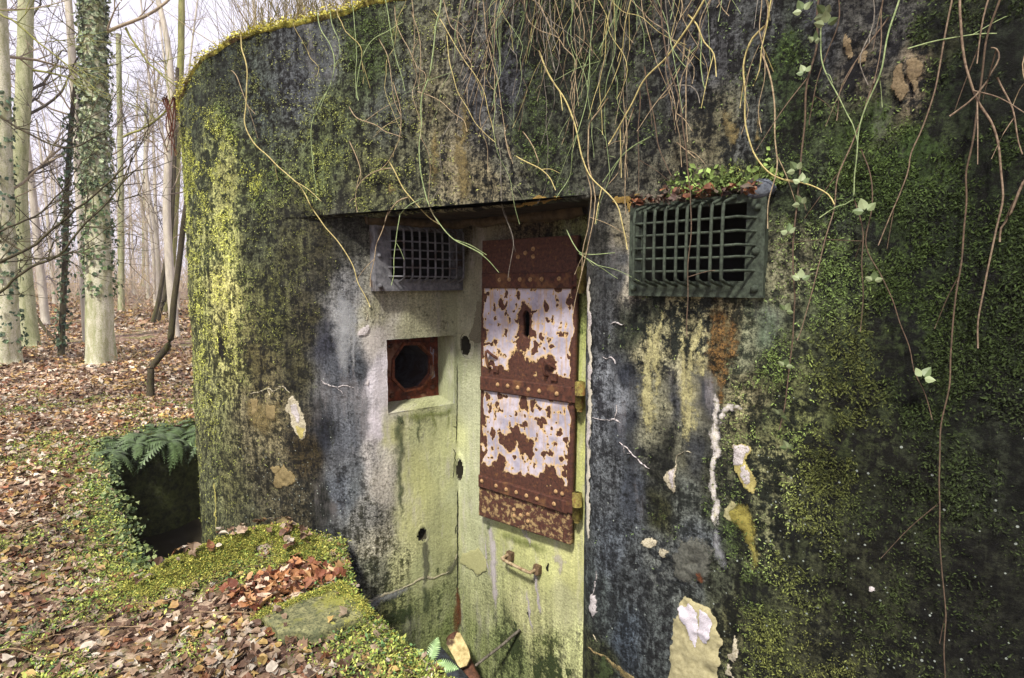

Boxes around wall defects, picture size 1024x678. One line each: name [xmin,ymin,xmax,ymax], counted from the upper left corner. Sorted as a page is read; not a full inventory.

peeling [843,34,868,63]
peeling [890,58,923,101]
water stain [338,300,356,365]
corrosion [707,306,740,404]
peeling [247,396,306,439]
spalling [270,464,295,488]
crack [592,405,647,468]
spalling [663,451,690,493]
water stain [709,394,742,522]
spalling [732,443,757,493]